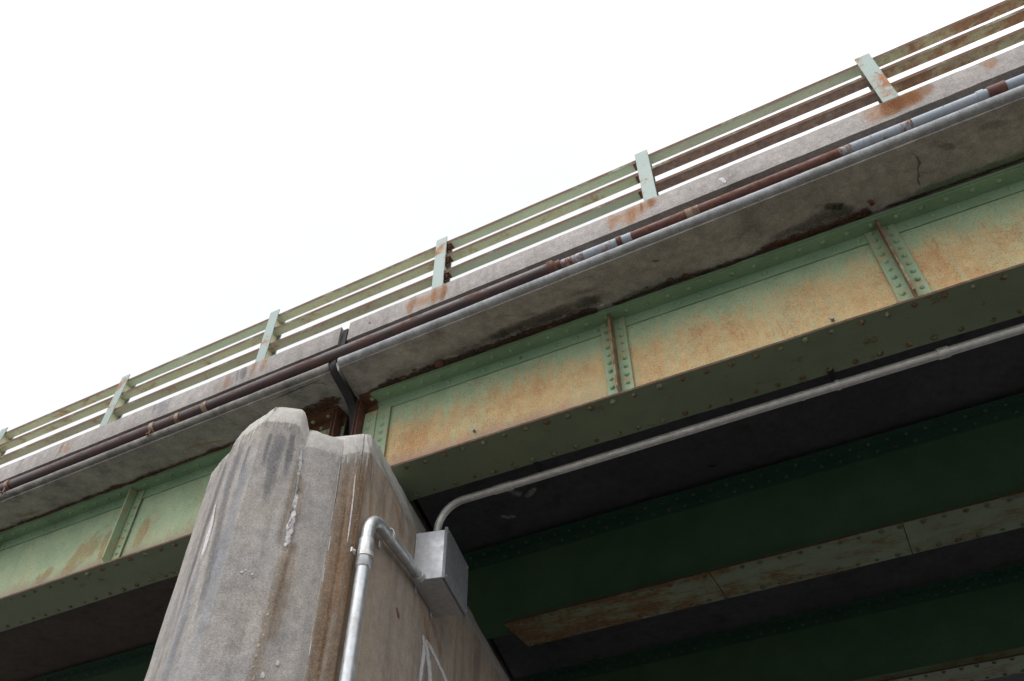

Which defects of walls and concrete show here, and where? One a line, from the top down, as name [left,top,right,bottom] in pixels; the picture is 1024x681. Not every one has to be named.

water stain [241,415,374,655]